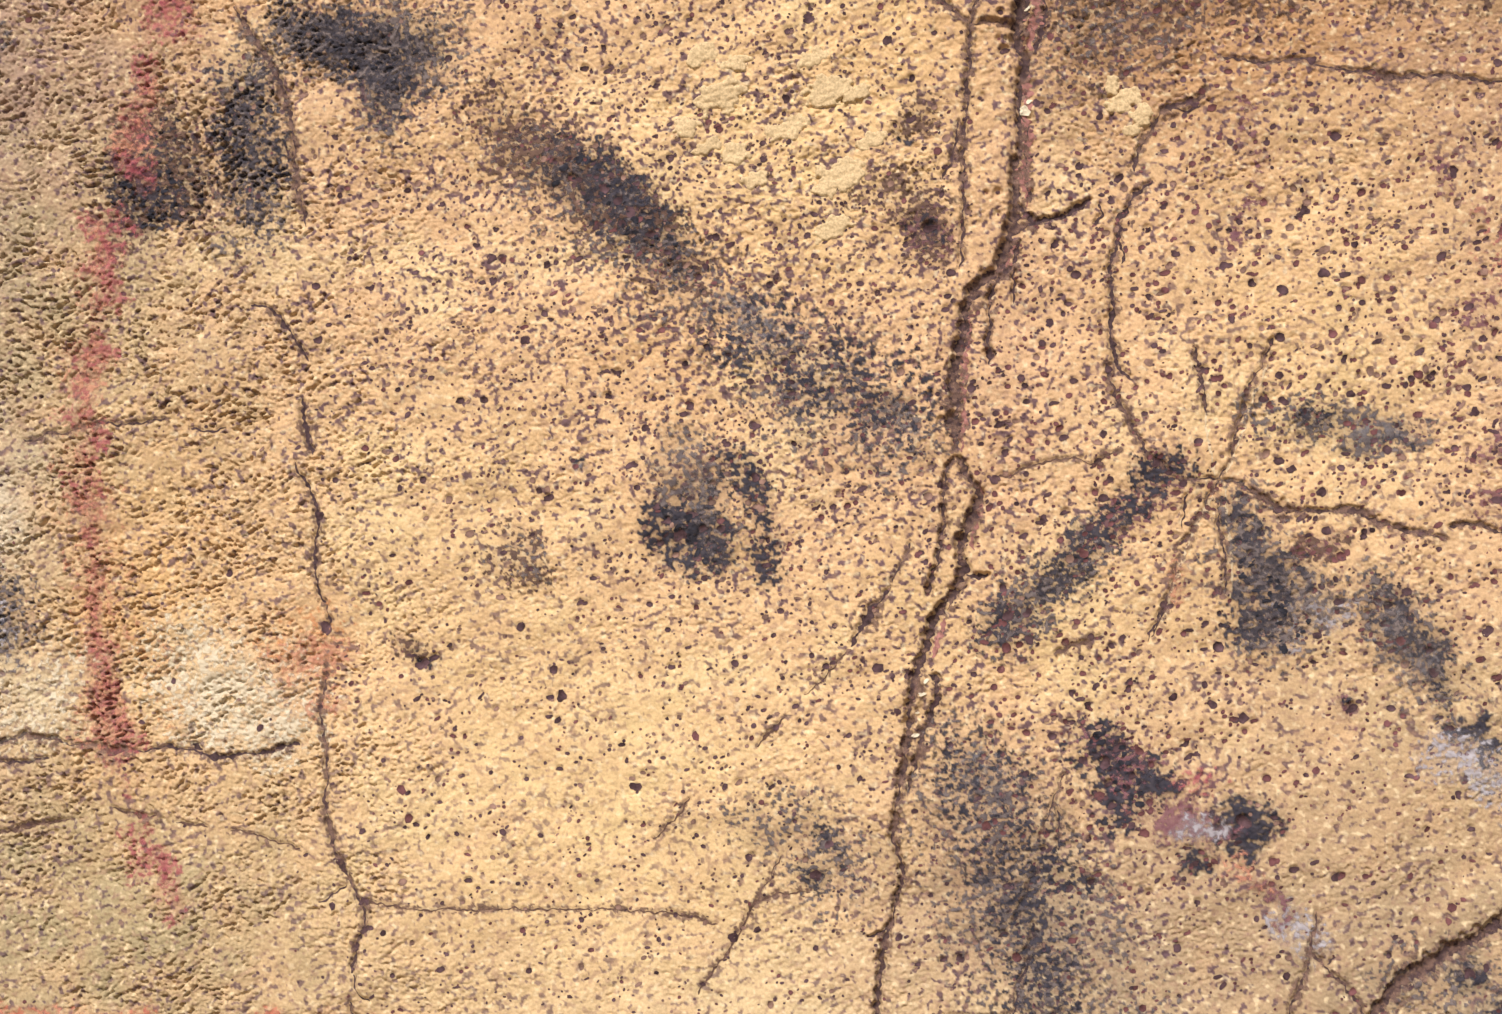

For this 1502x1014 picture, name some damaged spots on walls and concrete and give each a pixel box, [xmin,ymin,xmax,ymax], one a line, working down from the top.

crack [251,301,309,361]
crack [0,398,810,1014]
crack [757,0,1502,1014]